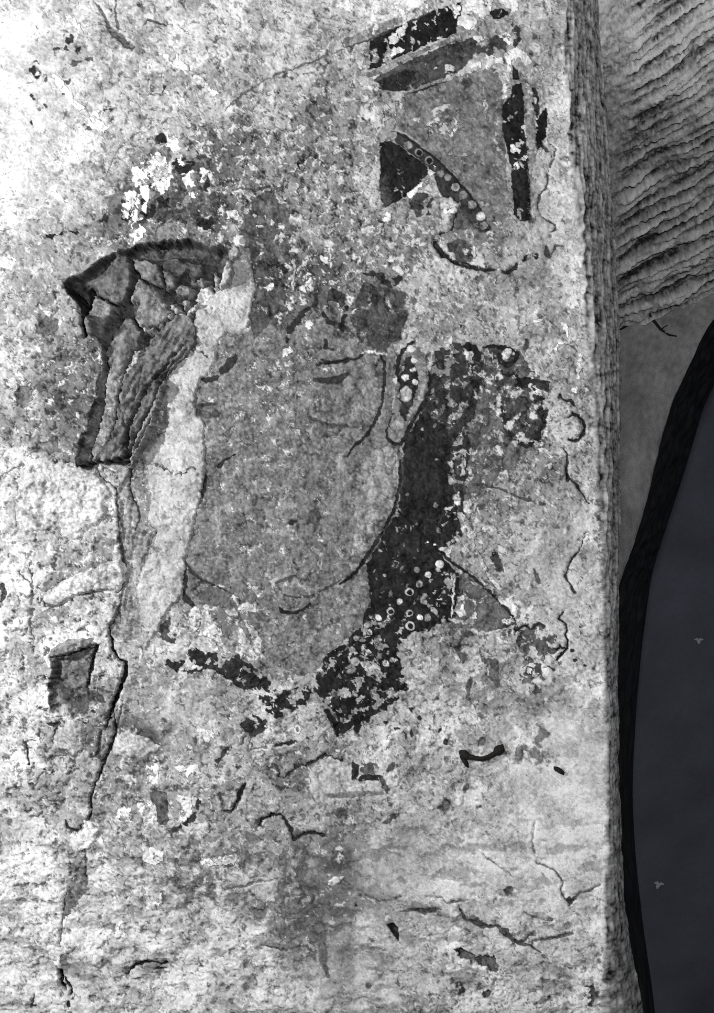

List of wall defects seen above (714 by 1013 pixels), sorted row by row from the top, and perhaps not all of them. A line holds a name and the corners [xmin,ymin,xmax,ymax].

crack [559,394,590,504]
spalling [47,637,105,719]
crack [26,463,196,1007]
crack [366,835,601,953]